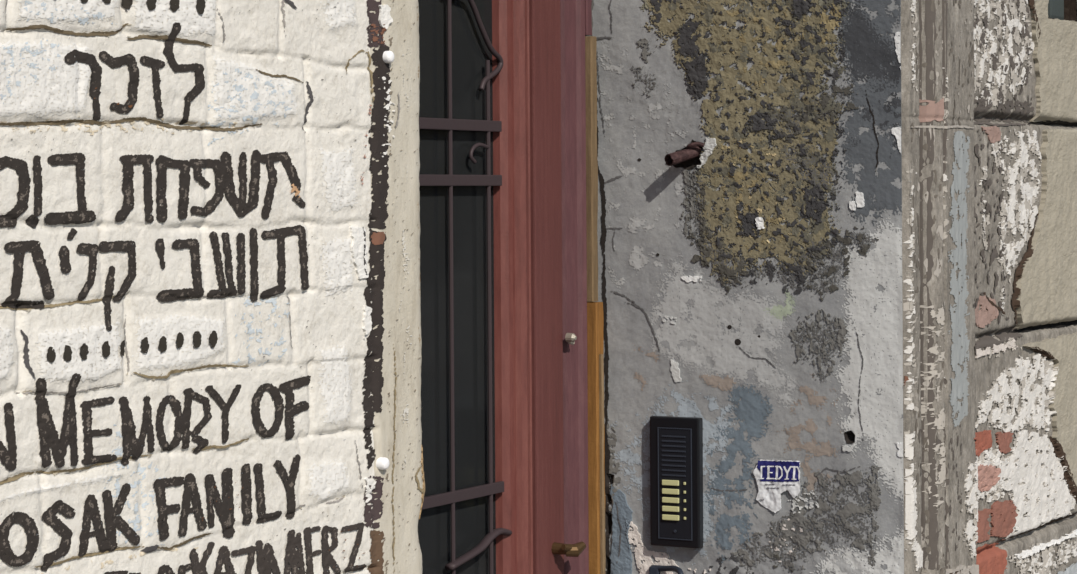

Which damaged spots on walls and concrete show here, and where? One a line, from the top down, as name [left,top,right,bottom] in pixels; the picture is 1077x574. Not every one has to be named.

crack [816,322,864,477]
peeling [896,431,923,571]
peeling [903,172,917,410]
peeling [964,339,1077,574]